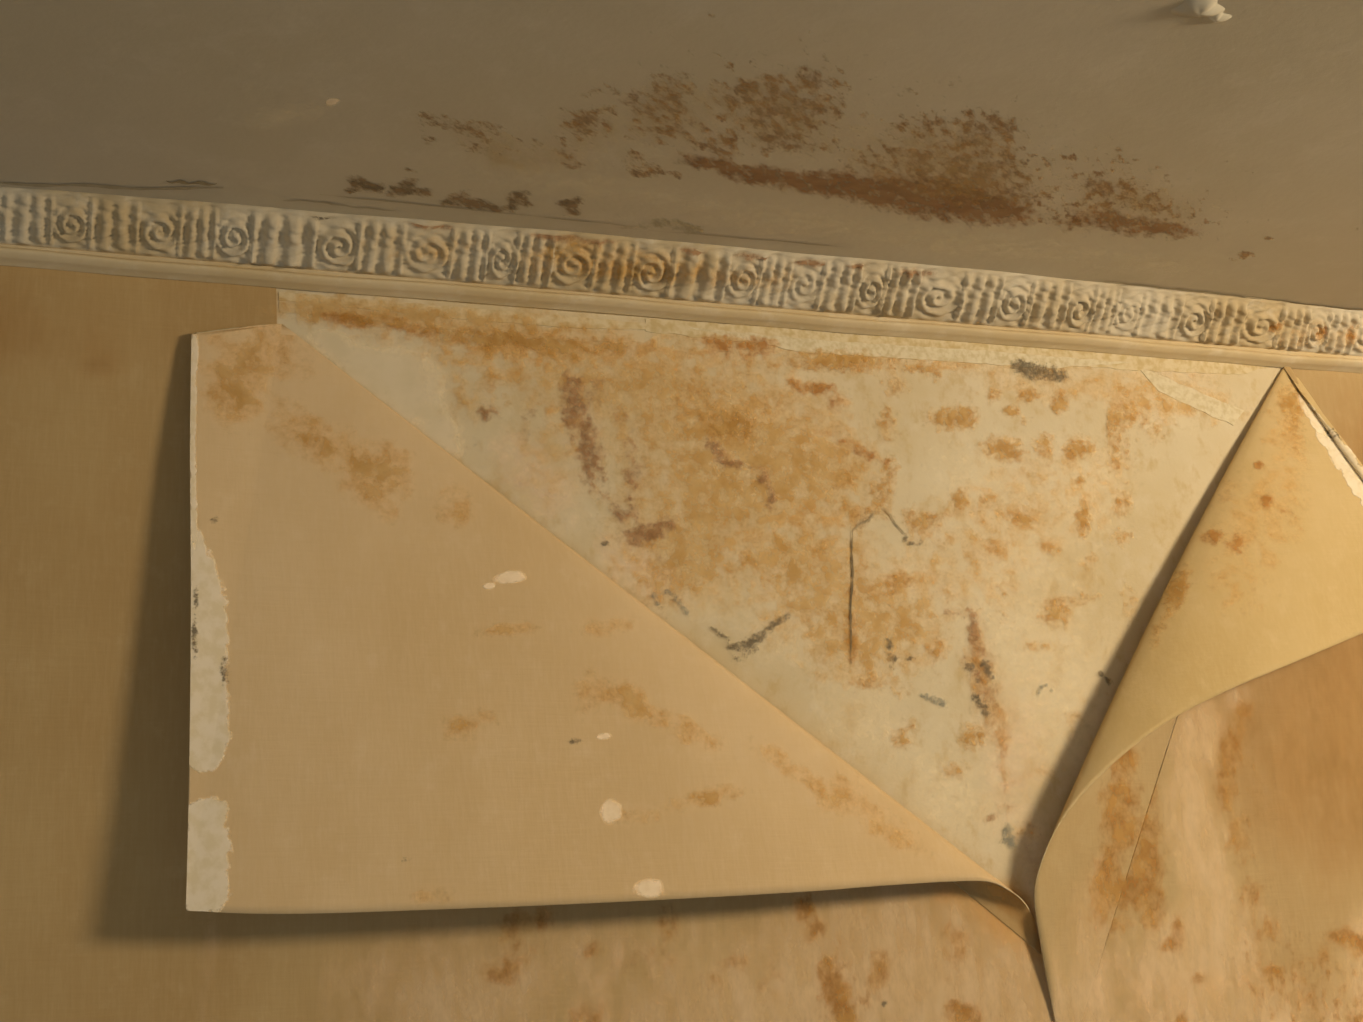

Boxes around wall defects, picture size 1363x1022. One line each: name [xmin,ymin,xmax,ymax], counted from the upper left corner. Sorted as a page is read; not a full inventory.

mould [629,64,1195,237]
mould [346,168,533,212]
mould [559,198,580,215]
damp [1004,359,1077,416]
damp [930,407,975,428]
damp [988,440,1022,459]
damp [1066,440,1092,459]
damp [1107,382,1191,467]
damp [537,327,943,687]
damp [1095,749,1163,925]
damp [802,957,996,1022]